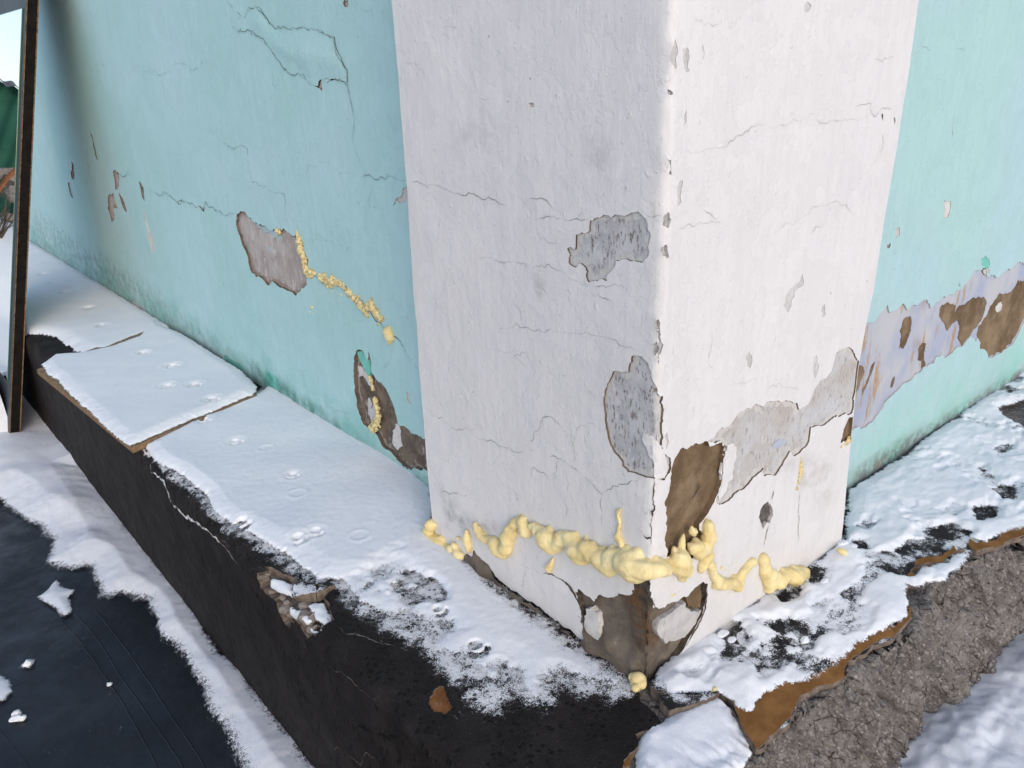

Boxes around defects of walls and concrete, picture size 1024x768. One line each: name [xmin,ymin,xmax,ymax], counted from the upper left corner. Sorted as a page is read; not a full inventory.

peeling [108,170,127,222]
peeling [139,181,155,253]
spalling [236,211,308,296]
crack [230,5,621,299]
peeling [567,212,669,282]
spalling [353,349,427,471]
peeling [603,256,1024,559]
crack [151,471,263,579]
crack [423,407,655,542]
spalling [257,566,334,639]
spalling [463,551,708,682]